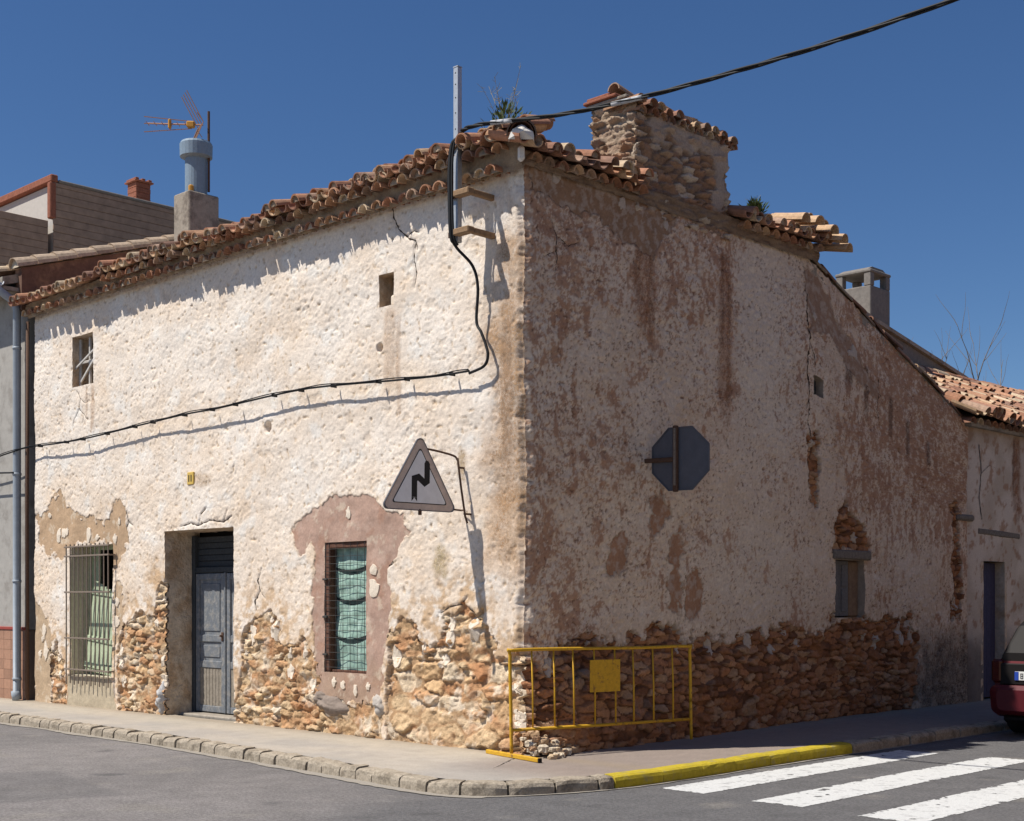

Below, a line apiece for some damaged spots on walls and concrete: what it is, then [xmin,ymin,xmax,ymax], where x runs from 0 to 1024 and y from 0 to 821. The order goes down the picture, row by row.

crack [392,209,417,283]
crack [804,285,816,436]
spalling [806,432,821,508]
spalling [35,489,169,715]
spalling [233,490,921,755]
spalling [948,502,965,620]